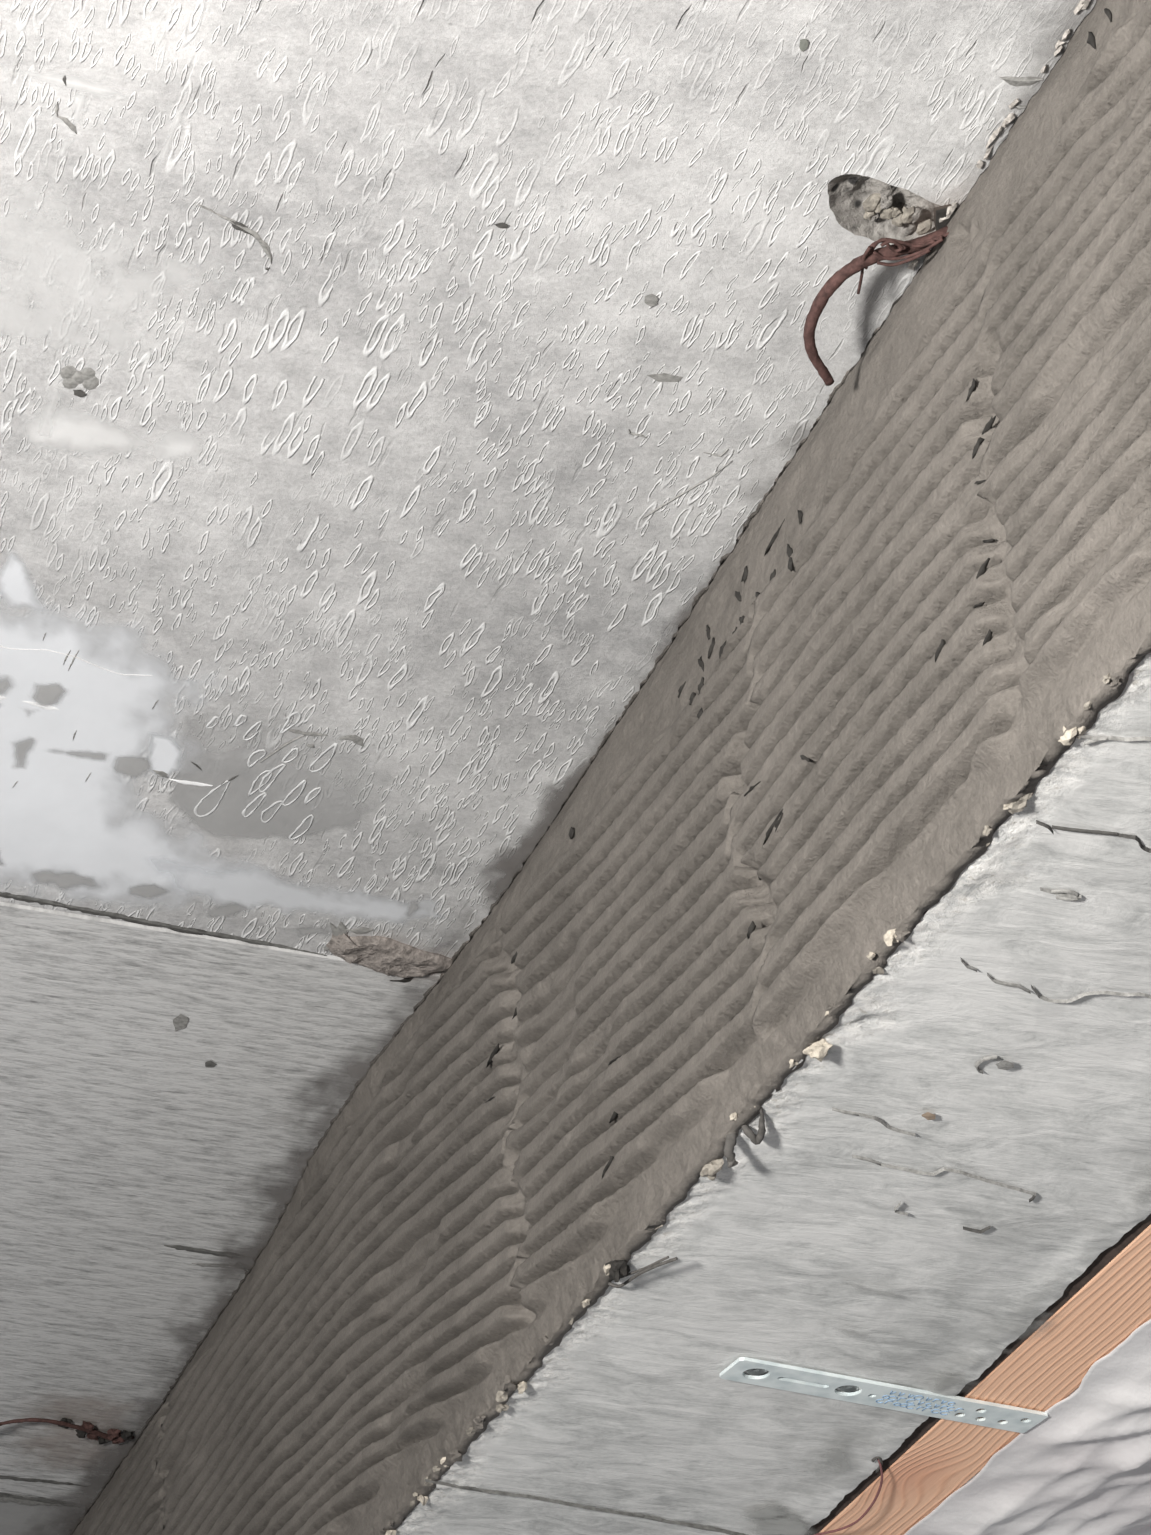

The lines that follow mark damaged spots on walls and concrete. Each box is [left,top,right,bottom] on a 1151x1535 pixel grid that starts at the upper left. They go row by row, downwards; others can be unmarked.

spalling [803,174,958,386]
water stain [0,555,430,921]
crack [1036,820,1151,853]
peeling [34,871,95,888]
peeling [131,885,166,898]
spalling [298,922,452,983]
crack [961,958,1151,1003]
crack [832,1107,1036,1202]